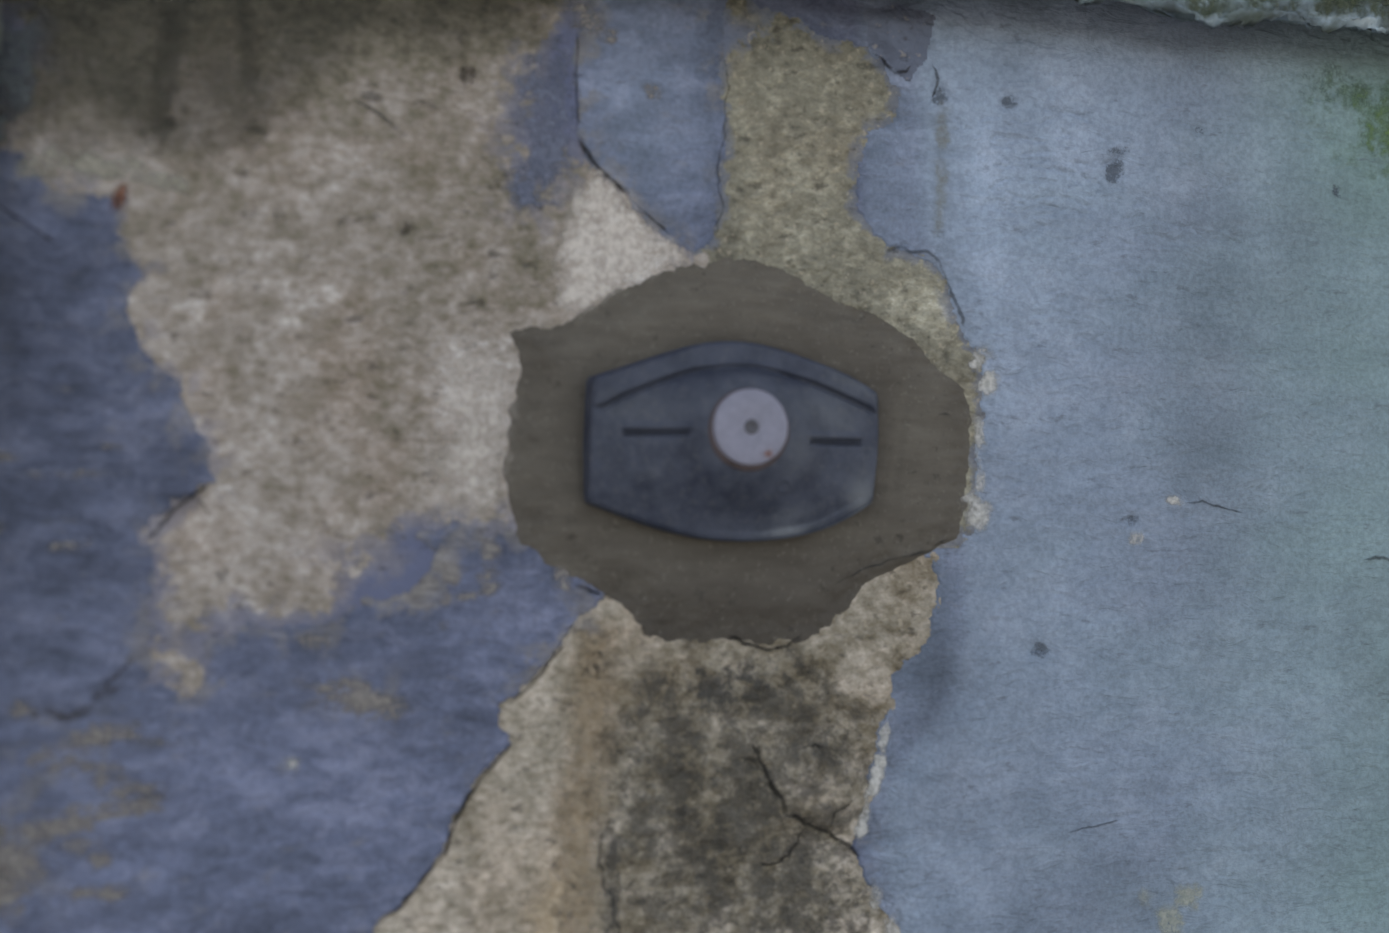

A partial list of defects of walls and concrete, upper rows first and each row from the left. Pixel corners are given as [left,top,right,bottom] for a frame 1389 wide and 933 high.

crack [149,485,207,538]
peeling [0,0,996,933]
crack [747,748,856,866]